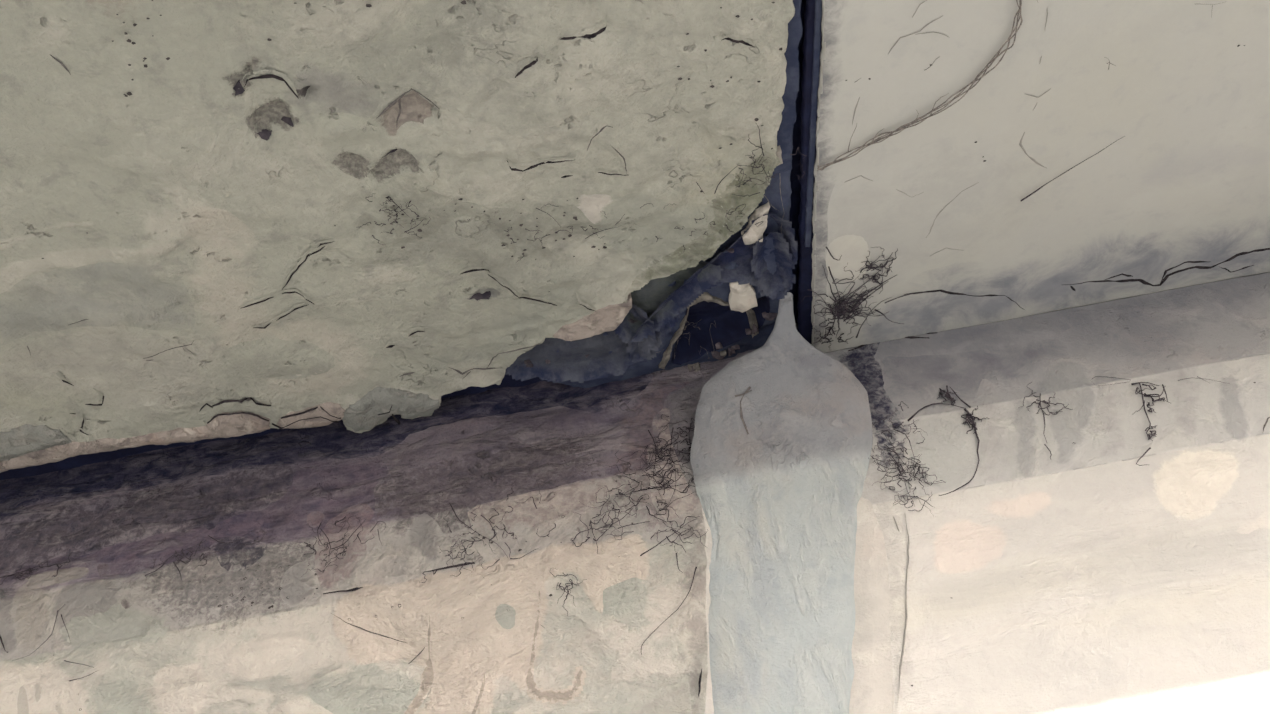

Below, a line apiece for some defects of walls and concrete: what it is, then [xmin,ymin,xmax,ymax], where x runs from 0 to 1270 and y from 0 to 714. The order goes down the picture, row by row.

crack [888,0,950,54]
peeling [0,0,798,473]
crack [844,175,979,256]
water stain [817,117,1270,490]
crack [1066,248,1270,291]
water stain [0,371,658,659]
peeling [0,478,662,714]
peeling [647,407,702,530]